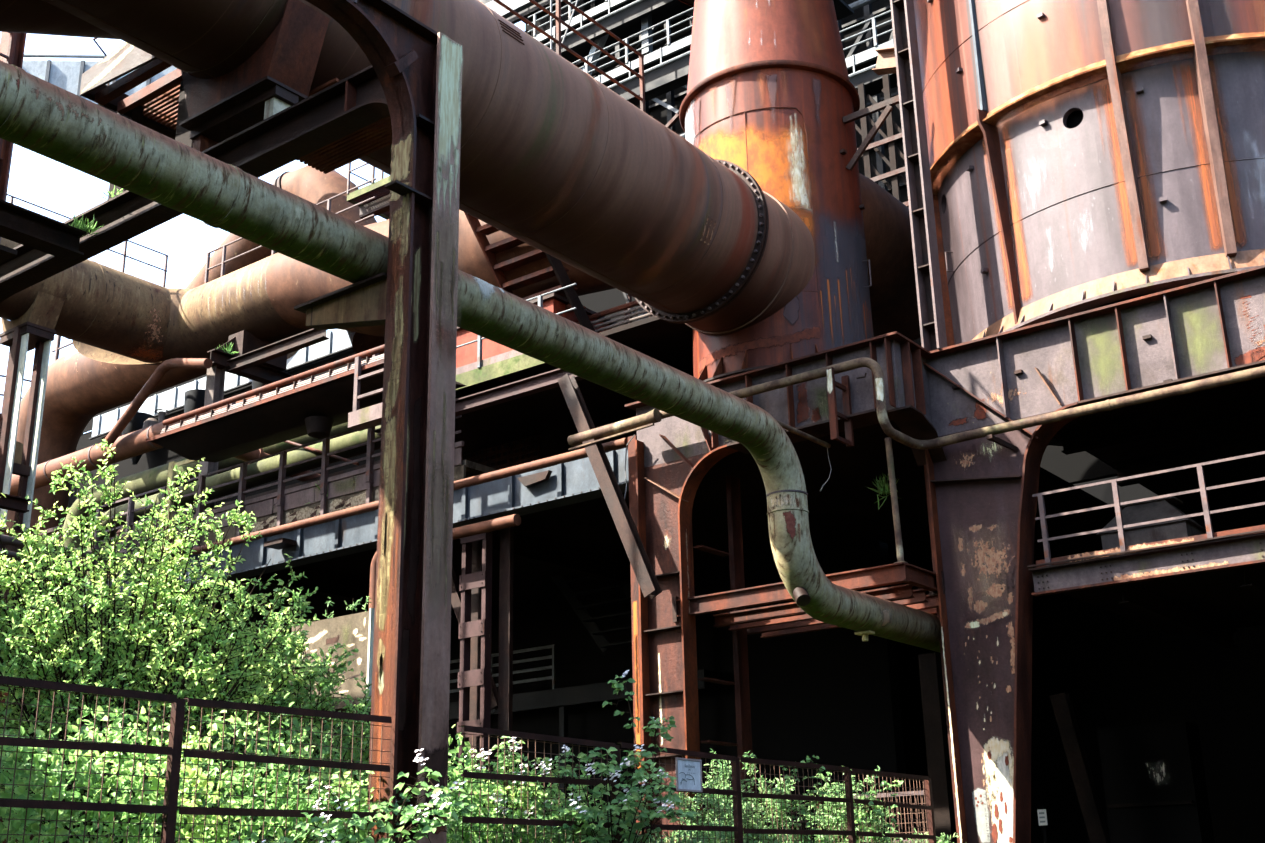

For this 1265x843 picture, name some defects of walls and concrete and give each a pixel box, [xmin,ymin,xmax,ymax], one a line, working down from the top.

corrosion [640,74,811,283]
corrosion [1094,76,1162,264]
corrosion [1173,59,1246,249]
corrosion [820,268,873,342]
peeling [965,609,1015,843]